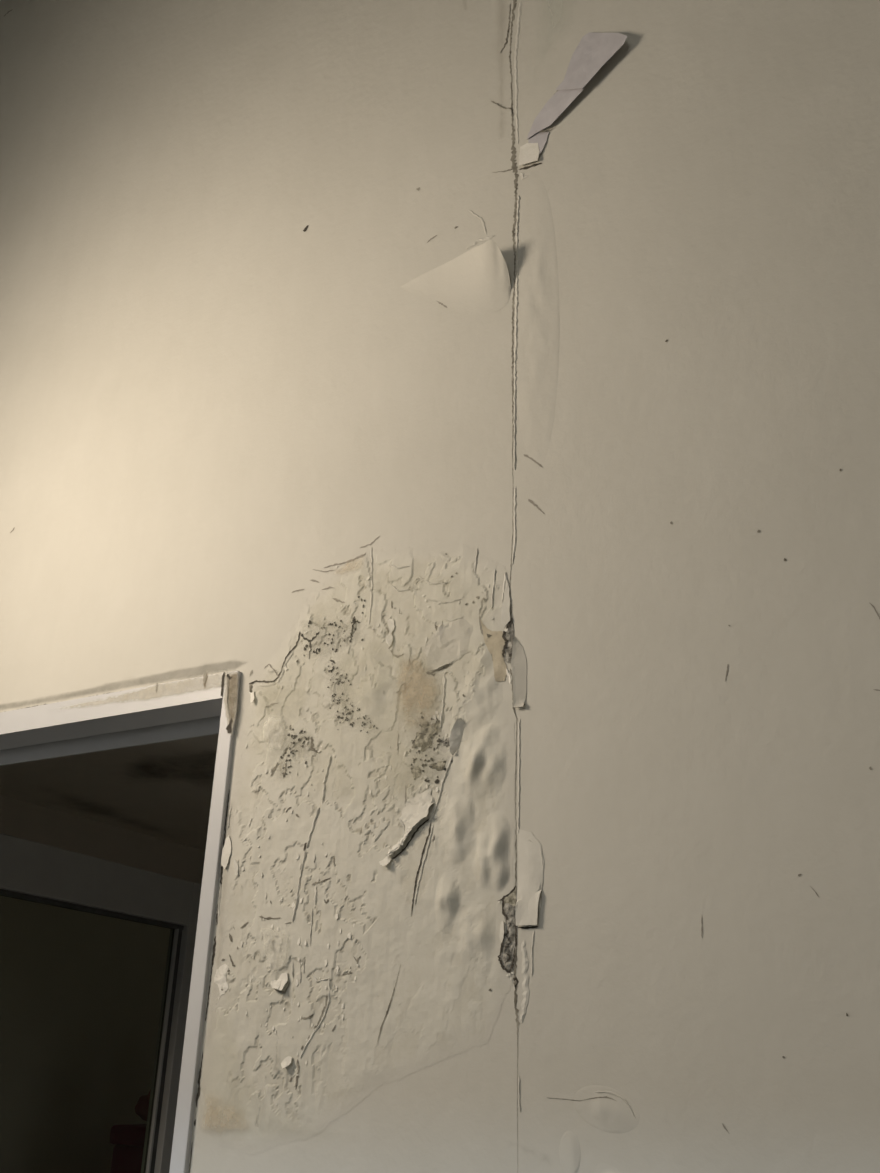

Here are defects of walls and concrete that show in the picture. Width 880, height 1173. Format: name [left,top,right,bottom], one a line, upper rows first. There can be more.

peeling [519,143,542,180]
crack [491,0,522,623]
peeling [292,537,379,623]
damp [284,596,378,733]
flaking render [379,570,527,866]
crack [512,679,521,895]
peeling [205,720,361,1090]
crack [377,965,401,1042]
crack [411,822,434,915]
flaking render [497,886,519,987]
crack [513,931,529,1173]